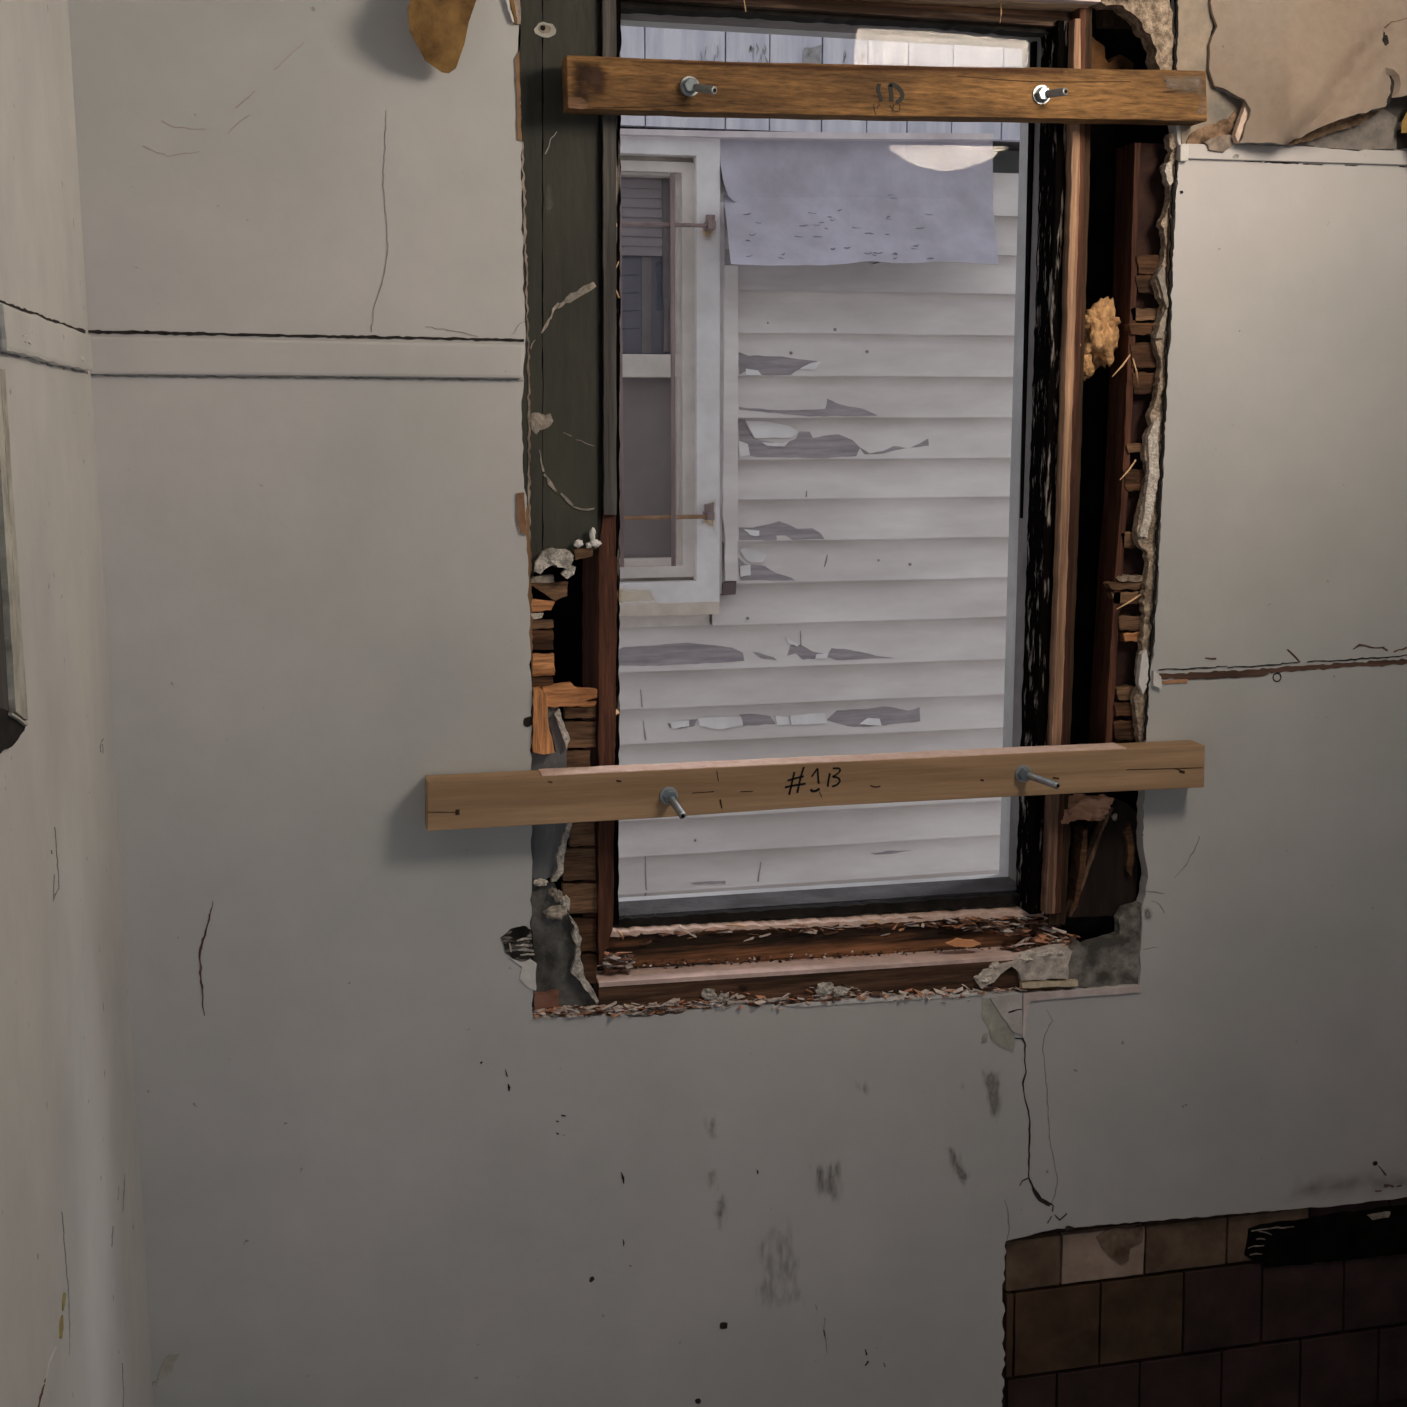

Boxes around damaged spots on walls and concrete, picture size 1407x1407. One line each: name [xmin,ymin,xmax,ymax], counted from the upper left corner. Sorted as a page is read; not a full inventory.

peeling [408,0,476,74]
peeling [505,0,522,141]
spalling [567,97,588,110]
spalling [1020,123,1035,518]
spalling [1085,0,1249,742]
spalling [529,527,602,689]
spalling [1070,364,1110,745]
flaking render [530,706,582,770]
spalling [1069,790,1138,813]
flaking render [501,823,604,1011]
flaking render [973,852,1142,1052]
crack [1005,1009,1058,1239]